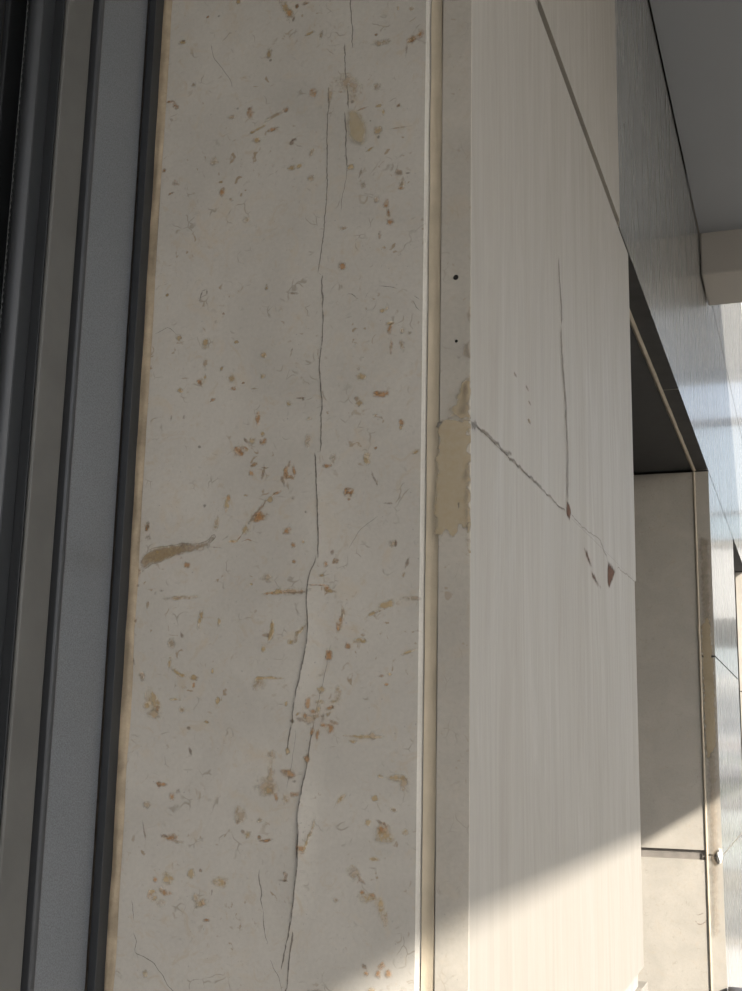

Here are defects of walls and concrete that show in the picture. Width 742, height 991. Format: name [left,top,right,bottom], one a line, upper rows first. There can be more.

crack [258,0,353,991]
peeling [434,381,471,536]
crack [472,263,634,581]